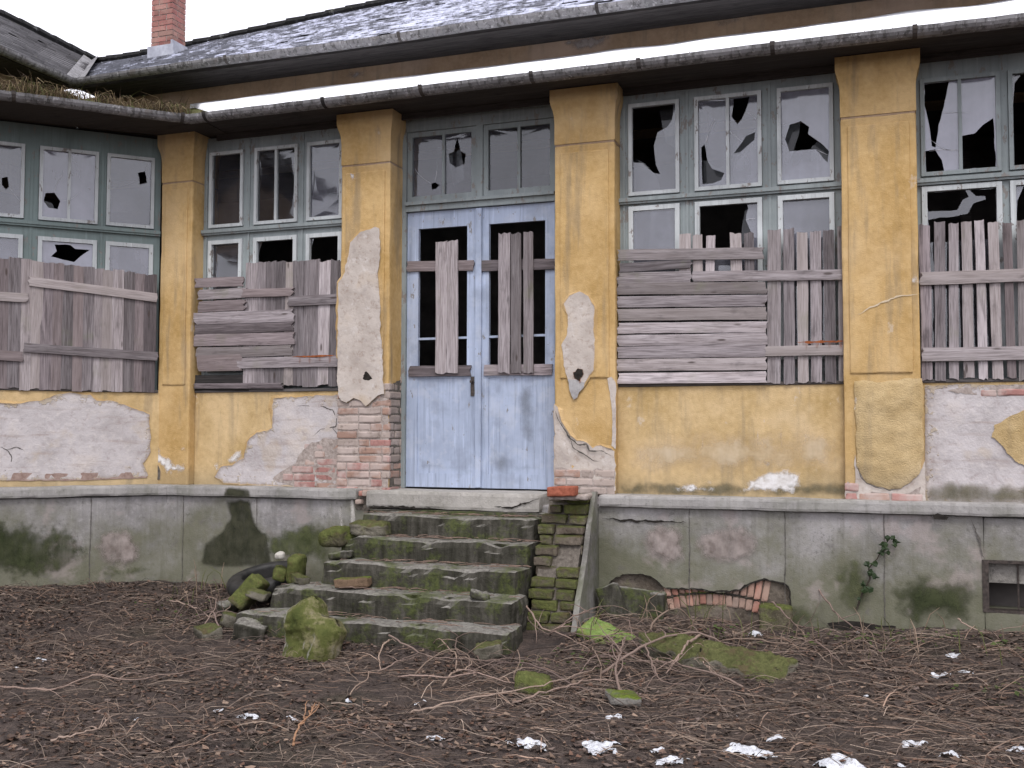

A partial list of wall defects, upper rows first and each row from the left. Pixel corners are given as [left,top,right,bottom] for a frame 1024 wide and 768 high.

peeling [214,227,402,511]
peeling [561,290,598,387]
crack [860,294,917,314]
peeling [0,392,184,481]
peeling [549,377,617,501]
peeling [845,384,1024,520]
crack [605,516,684,524]
flaking render [610,574,791,622]